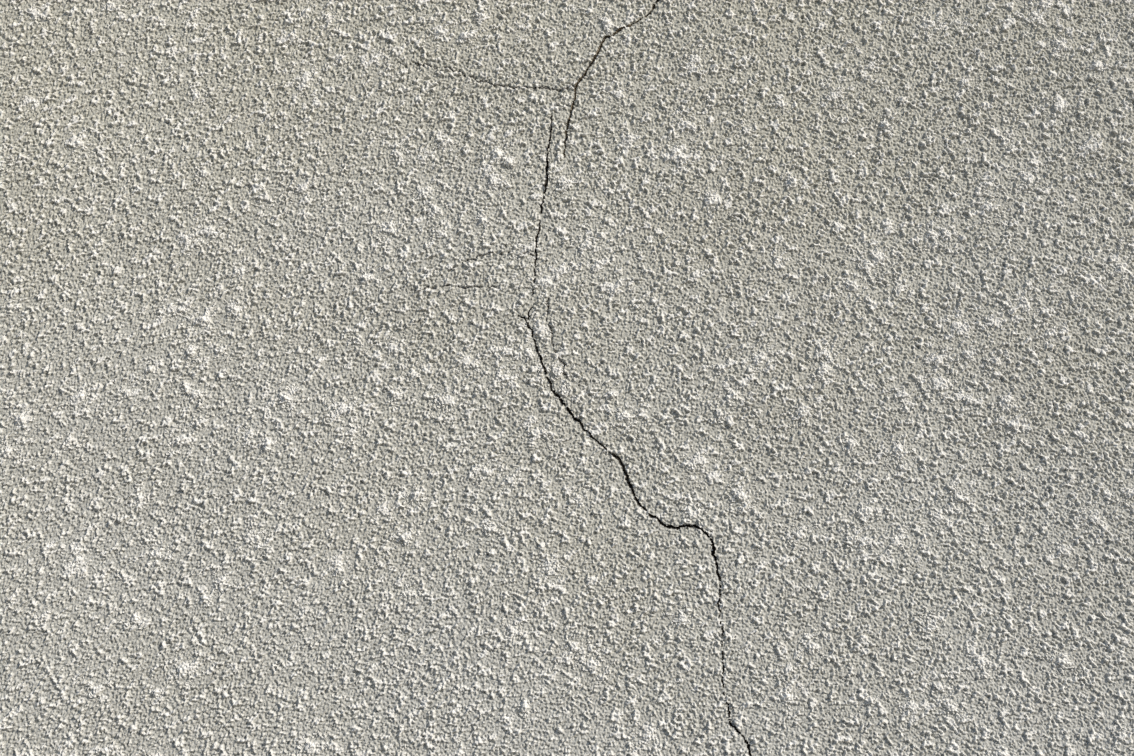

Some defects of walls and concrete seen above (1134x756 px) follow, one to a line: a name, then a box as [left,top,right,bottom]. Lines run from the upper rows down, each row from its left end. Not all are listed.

crack [397,0,751,756]